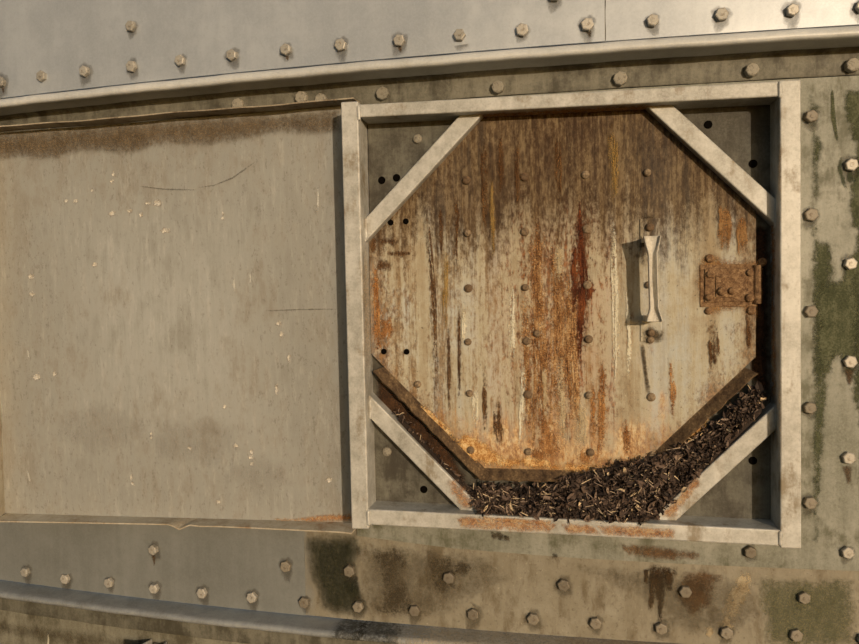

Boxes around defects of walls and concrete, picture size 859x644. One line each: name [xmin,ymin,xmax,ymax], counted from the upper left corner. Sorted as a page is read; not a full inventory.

rust [482,105,664,117]
leakage [838,161,859,184]
rust [426,210,461,405]
rust [520,202,608,465]
rust [718,207,776,396]
rust [482,374,504,442]
rust [378,380,472,507]
leakage [347,578,358,599]
leakage [376,550,411,612]
leakage [432,559,470,592]
rust [565,524,715,618]
leakage [409,626,678,644]